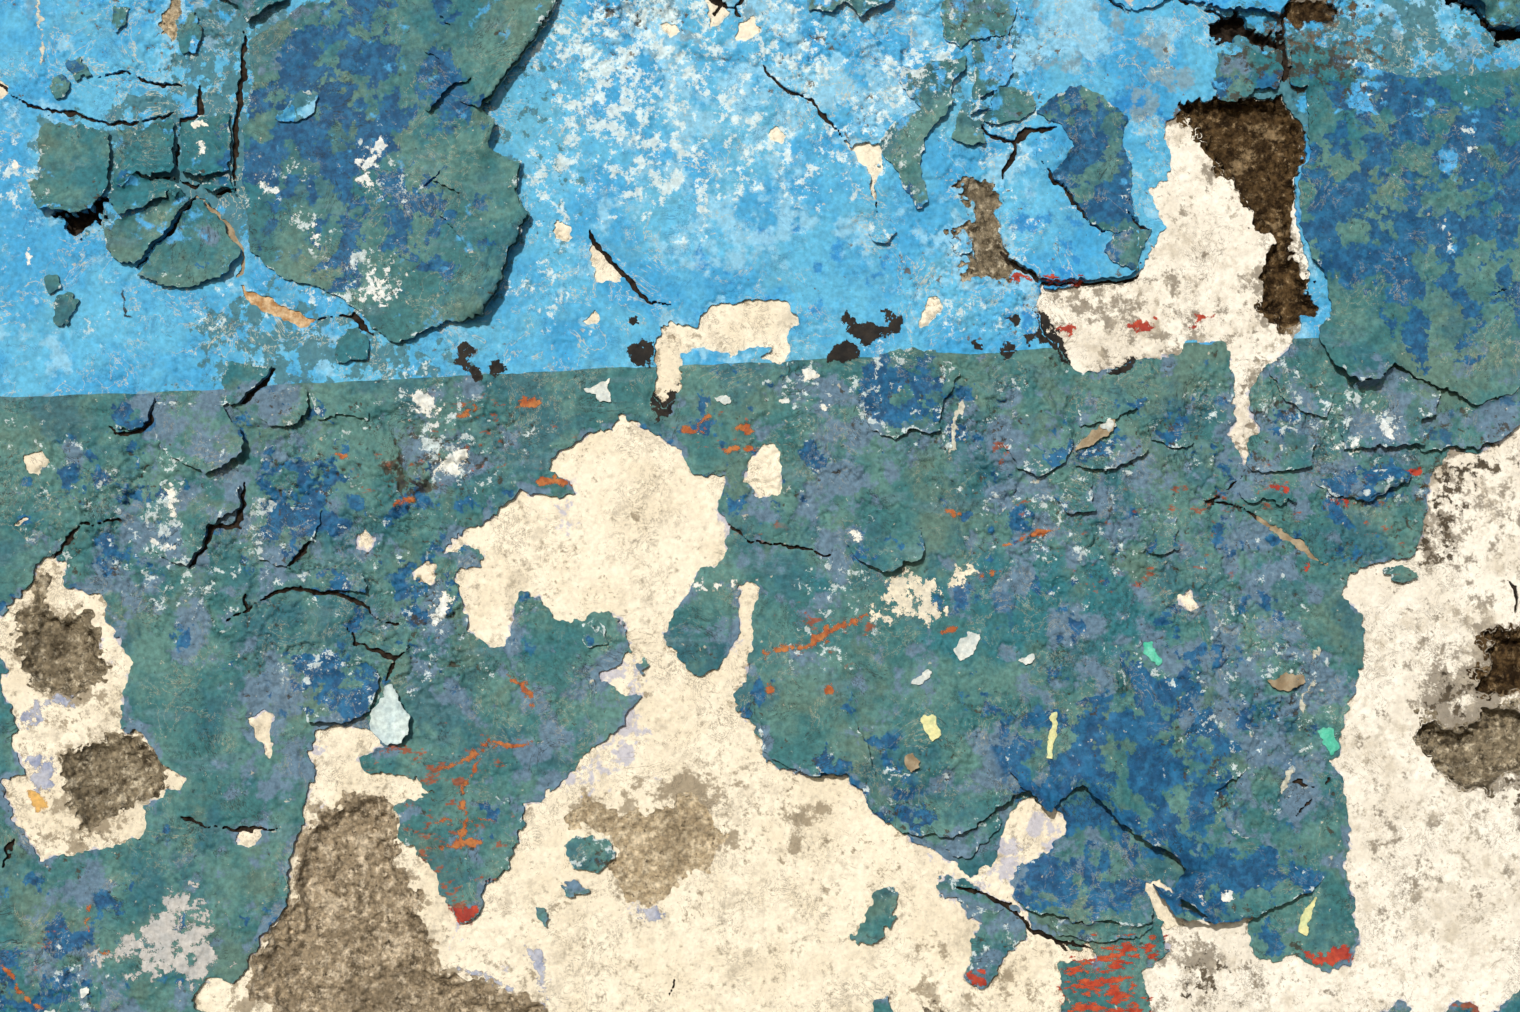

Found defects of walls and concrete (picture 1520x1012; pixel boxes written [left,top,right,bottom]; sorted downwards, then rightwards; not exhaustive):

crack [0,32,248,278]
crack [763,66,842,137]
peeling [940,0,1036,146]
peeling [943,85,1152,284]
peeling [1113,0,1163,11]
spalling [1188,0,1337,28]
peeling [1445,0,1520,48]
flaking render [1003,11,1520,1012]
flaking render [0,555,186,862]
flaking render [193,414,1097,1012]